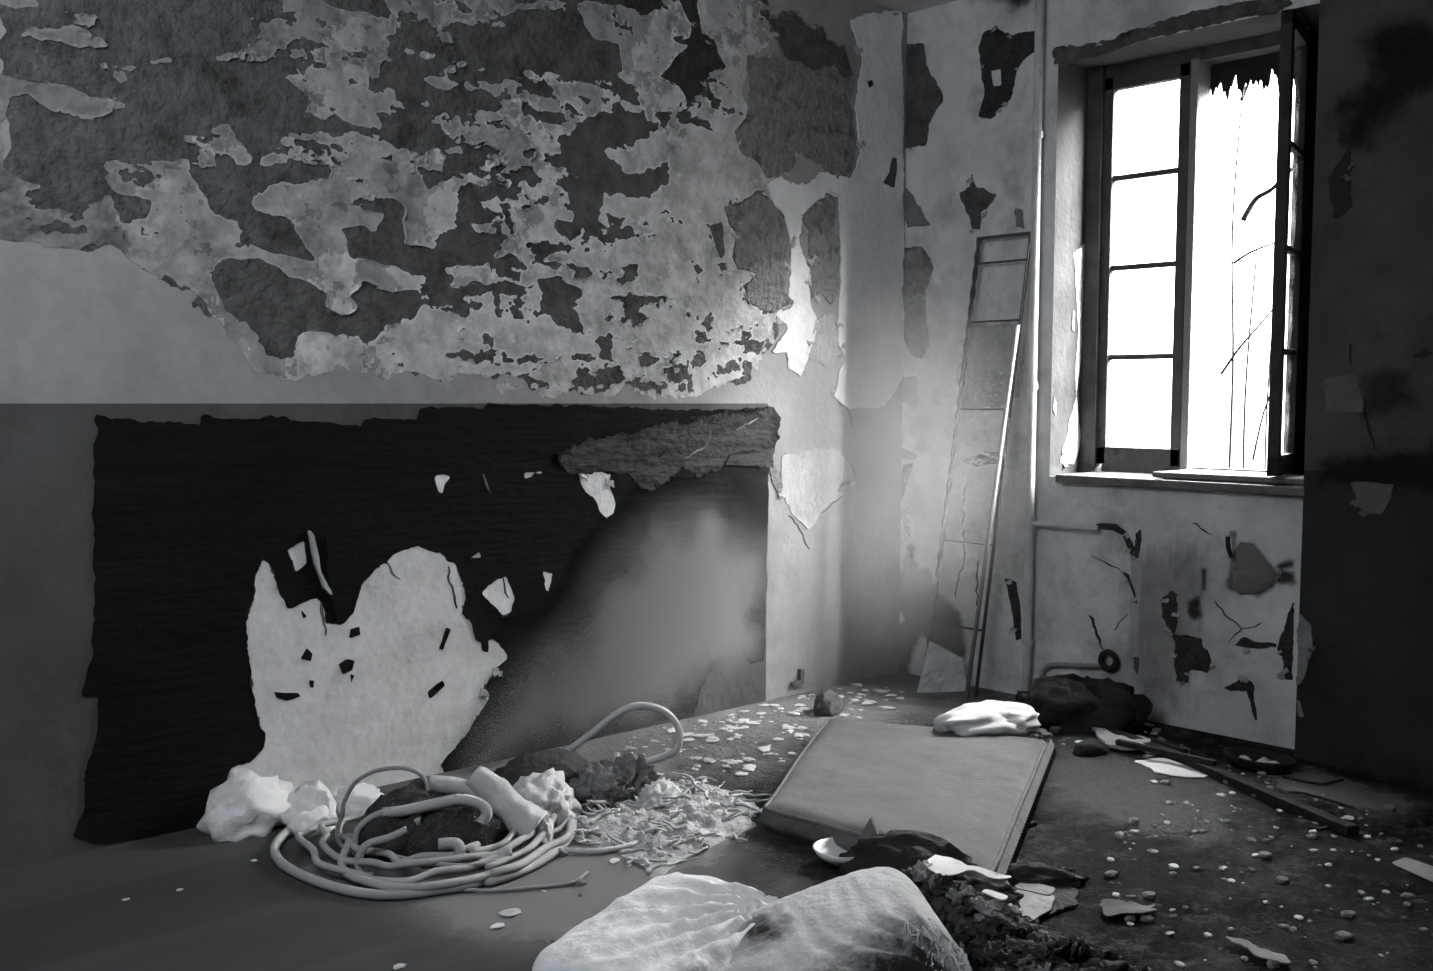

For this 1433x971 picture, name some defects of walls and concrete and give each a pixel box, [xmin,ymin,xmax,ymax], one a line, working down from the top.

flaking render [959,174,996,234]
peeling [1014,208,1025,229]
peeling [0,0,866,844]
peeling [1350,482,1394,518]
crack [1089,614,1127,650]
flaking render [1161,591,1215,685]
crack [1215,601,1262,642]
flaking render [1233,603,1316,718]
flaking render [1224,675,1257,720]